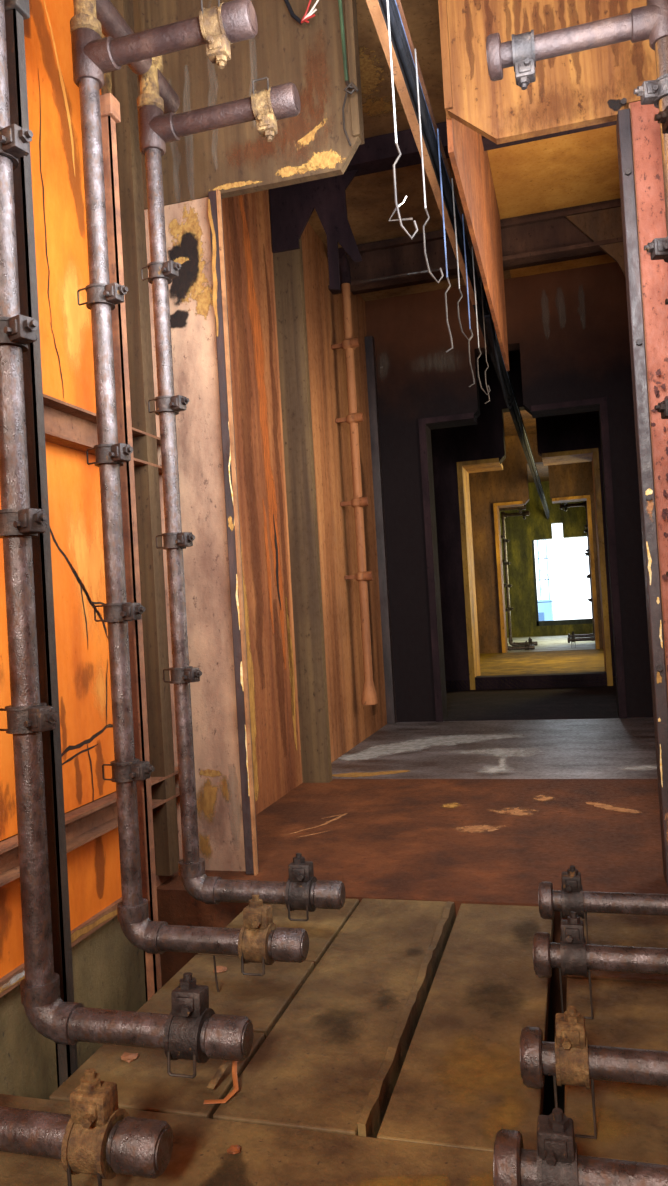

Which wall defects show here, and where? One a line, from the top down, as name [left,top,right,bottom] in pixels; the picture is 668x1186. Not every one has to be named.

peeling [276,118,342,178]
peeling [168,180,262,336]